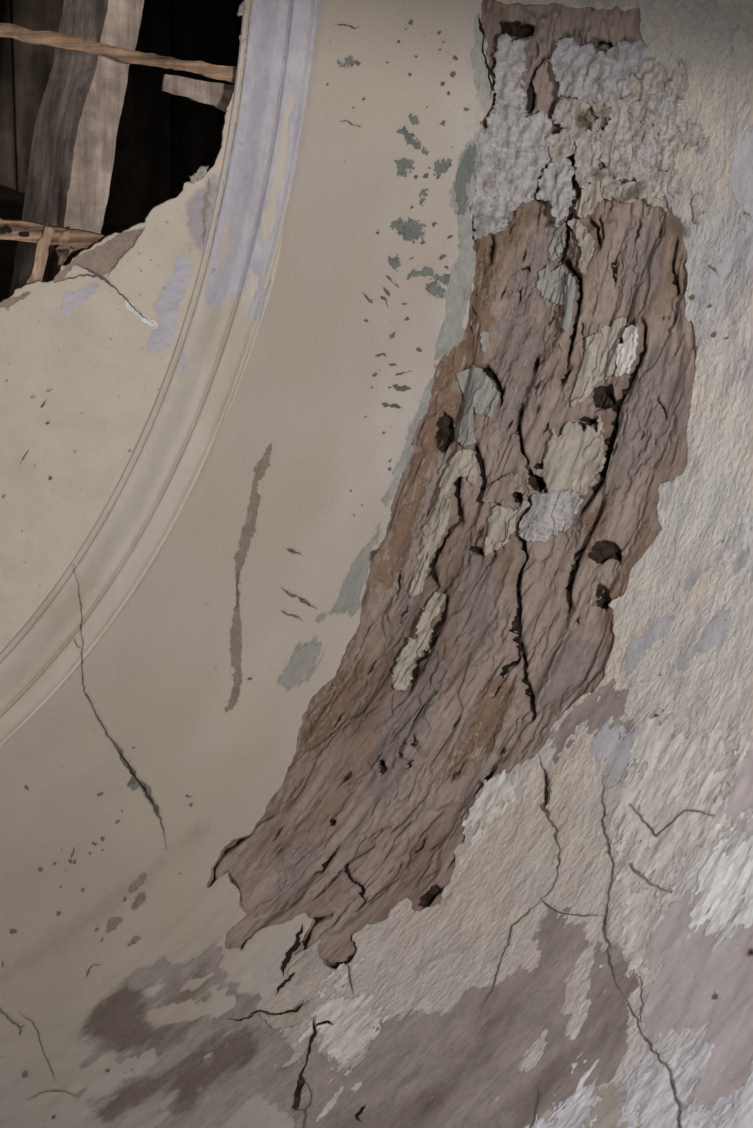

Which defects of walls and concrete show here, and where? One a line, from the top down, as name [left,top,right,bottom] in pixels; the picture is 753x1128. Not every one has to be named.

peeling [188,0,323,327]
peeling [0,291,31,309]
peeling [53,227,145,317]
peeling [147,255,192,376]
spalling [210,0,710,969]
crack [73,564,167,851]
peeling [654,603,731,717]
peeling [122,872,147,910]
crack [479,756,714,1128]
peeling [71,889,753,1128]
crack [291,1017,333,1128]